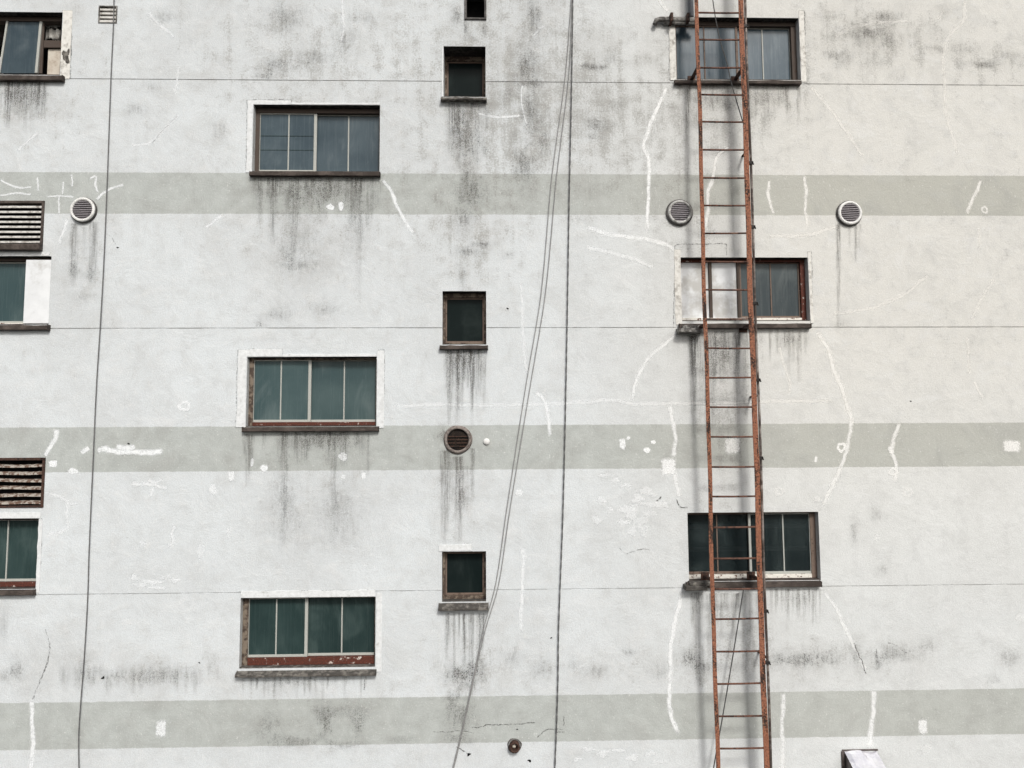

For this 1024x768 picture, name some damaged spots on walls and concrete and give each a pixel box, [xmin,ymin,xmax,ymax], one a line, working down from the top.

crack [29,629,50,768]
crack [825,592,877,746]